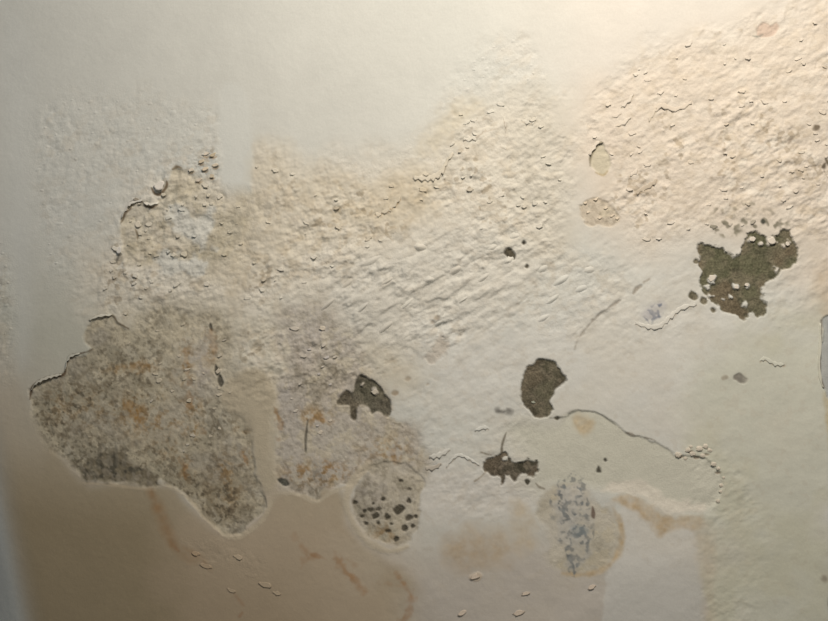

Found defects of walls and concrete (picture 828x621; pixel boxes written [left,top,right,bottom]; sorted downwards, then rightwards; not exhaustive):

peeling [115,152,277,287]
damp [222,90,488,312]
peeling [566,0,828,322]
damp [709,199,792,240]
damp [77,443,160,489]
peeling [27,292,439,555]
peeling [422,314,452,367]
peeling [473,358,725,590]
damp [638,297,669,325]
peeling [817,314,828,400]